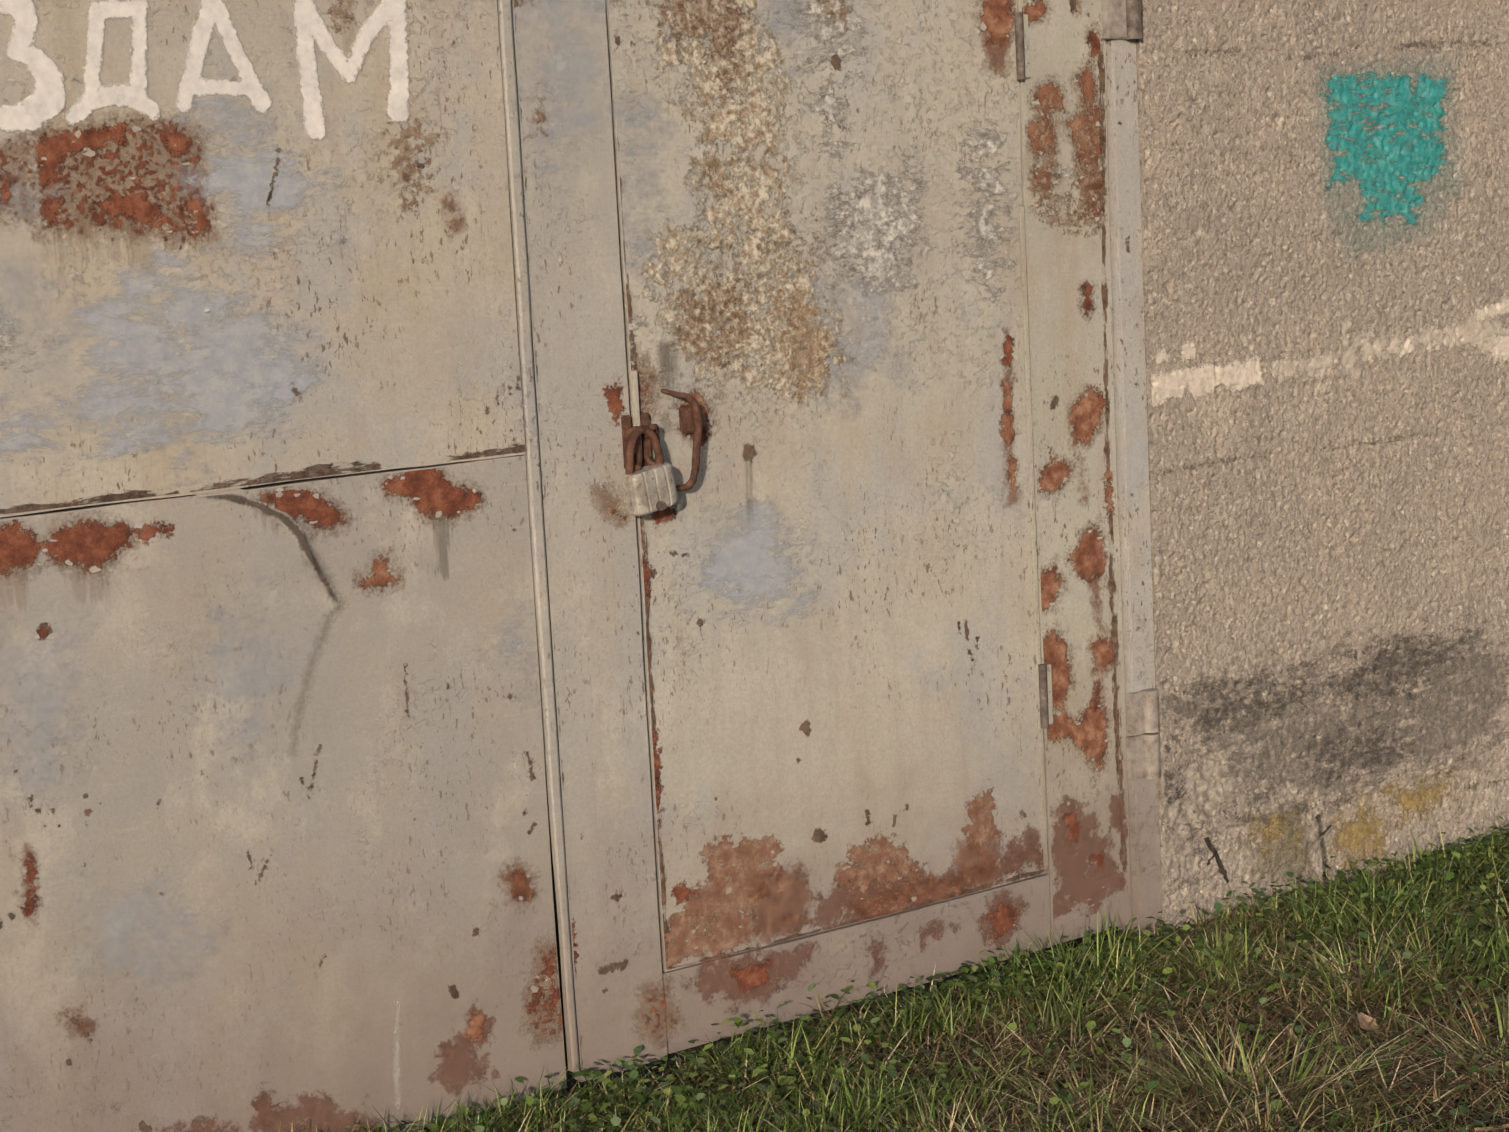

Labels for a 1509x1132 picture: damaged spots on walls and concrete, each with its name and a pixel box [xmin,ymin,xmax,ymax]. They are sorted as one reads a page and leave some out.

rust [593,31,1128,1013]